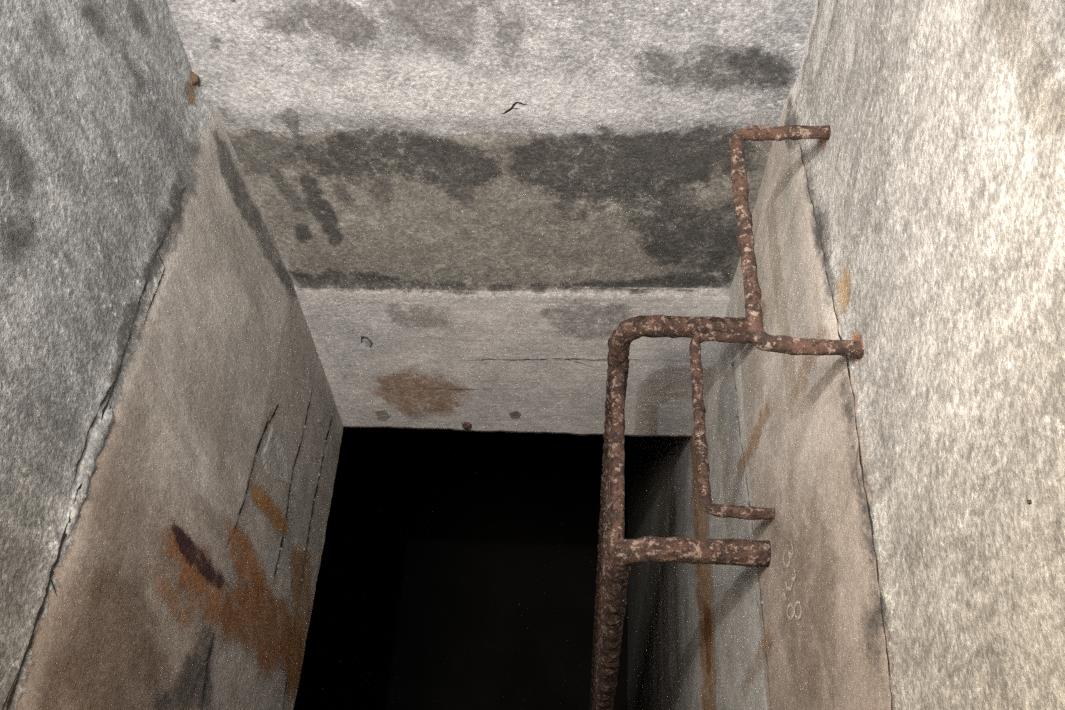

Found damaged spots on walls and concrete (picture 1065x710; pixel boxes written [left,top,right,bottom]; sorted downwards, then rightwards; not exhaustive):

leakage [0,120,34,256]
leakage [213,0,834,376]
leakage [110,140,200,393]
rust [250,482,288,533]
rust [377,373,467,415]
rust [732,405,769,505]
rust [167,525,311,696]
rust [696,564,716,710]